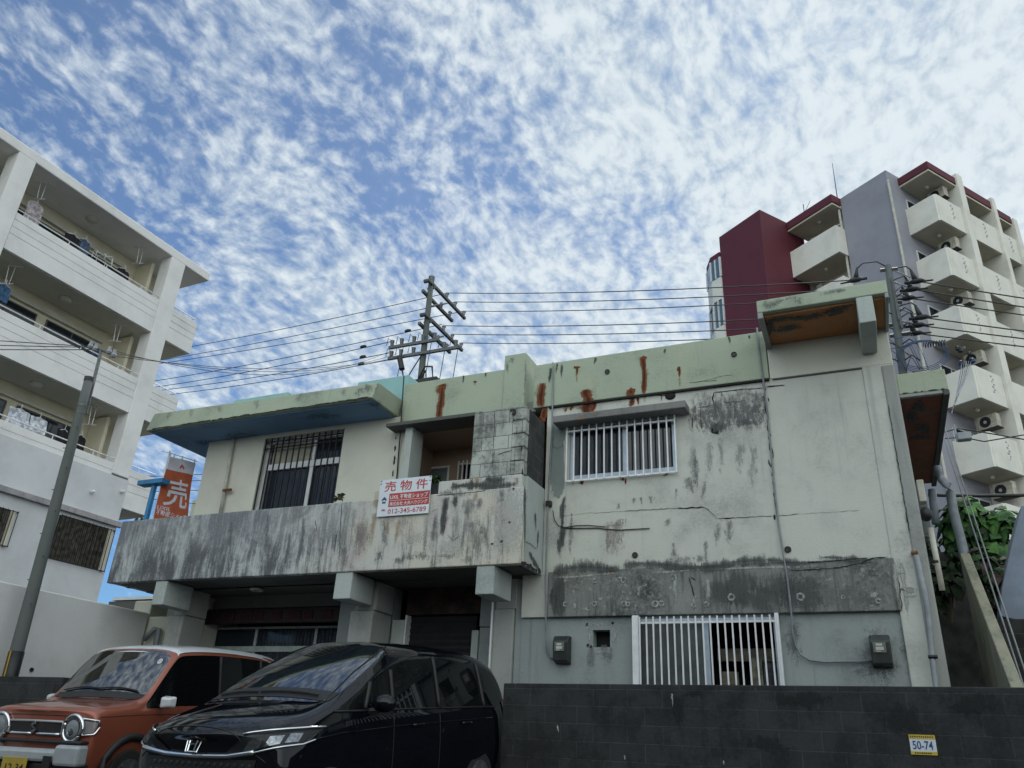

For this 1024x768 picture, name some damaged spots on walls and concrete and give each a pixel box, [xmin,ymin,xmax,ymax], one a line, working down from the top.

leakage [764,298,852,335]
rust [436,383,446,417]
rust [536,383,547,422]
rust [564,389,597,413]
rust [626,356,647,406]
leakage [692,391,764,432]
crack [568,375,859,520]
leakage [432,475,539,569]
leakage [549,424,883,615]